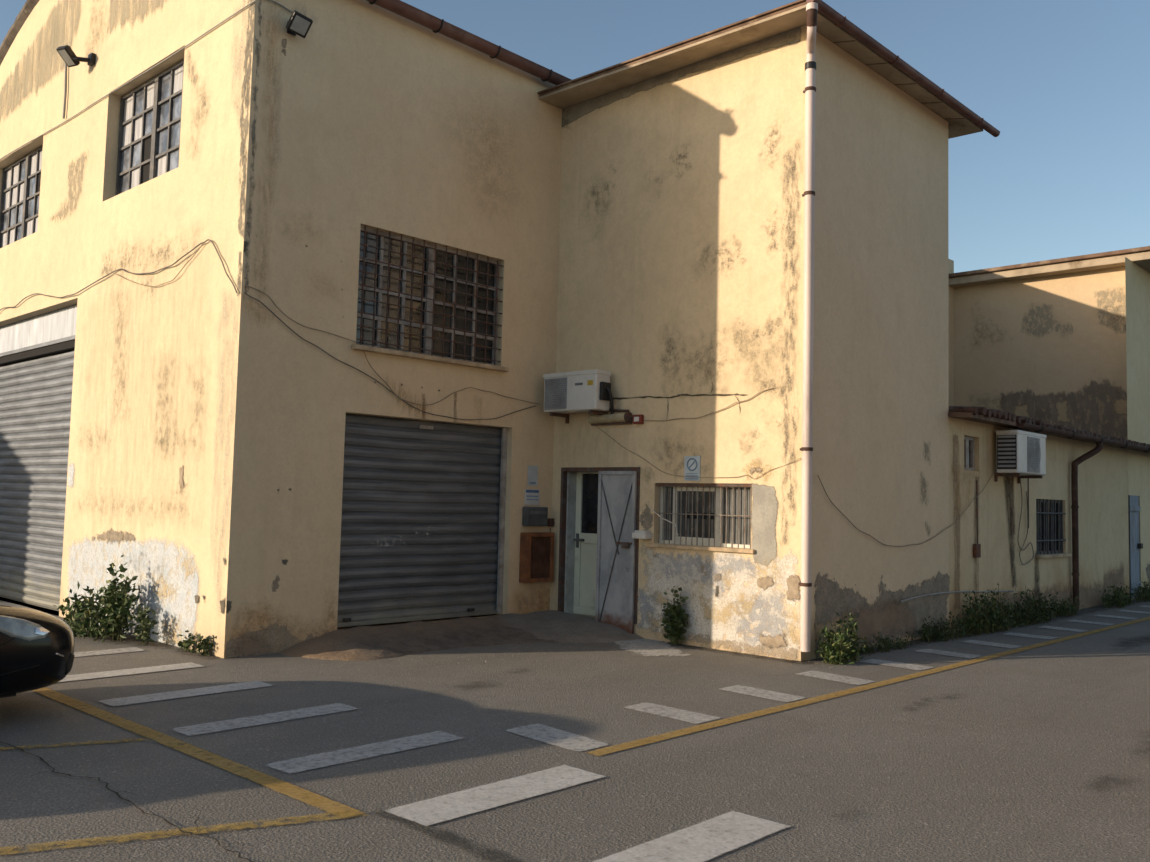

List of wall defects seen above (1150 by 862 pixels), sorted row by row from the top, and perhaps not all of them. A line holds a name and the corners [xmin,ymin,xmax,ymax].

damp [771,205,795,388]
flaking render [1095,289,1126,332]
flaking render [1001,381,1127,439]
peeling [68,529,204,647]
peeling [637,545,950,660]
crack [0,741,254,862]